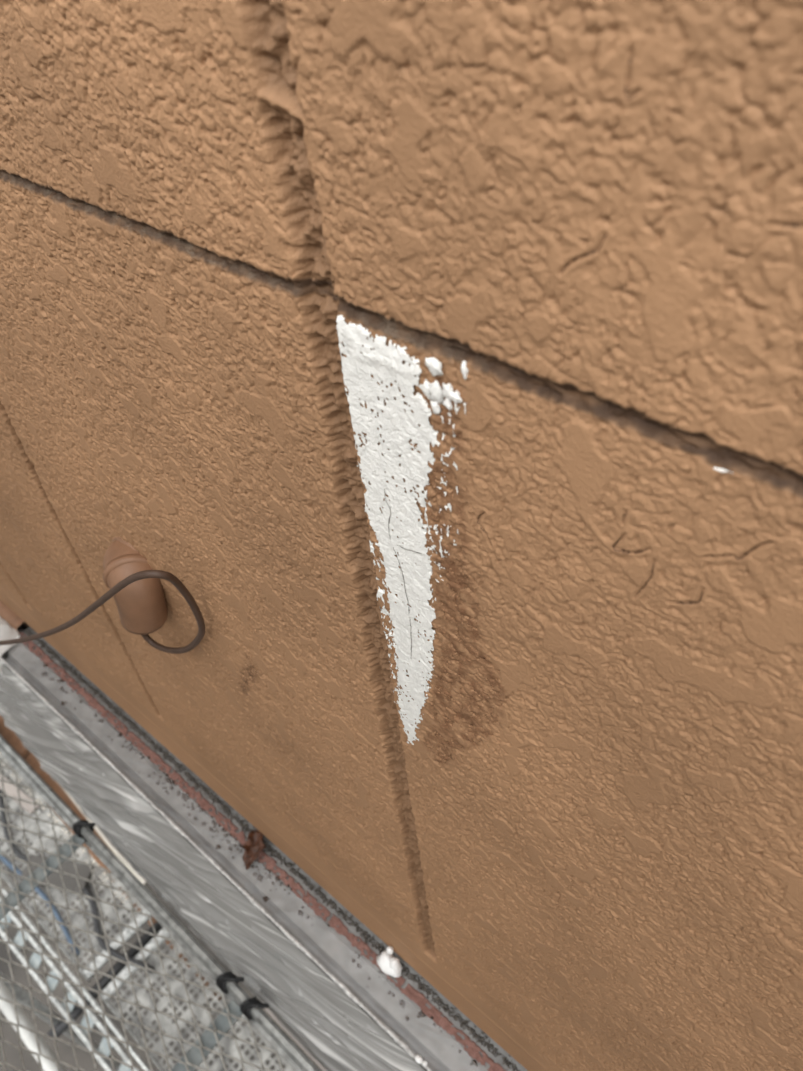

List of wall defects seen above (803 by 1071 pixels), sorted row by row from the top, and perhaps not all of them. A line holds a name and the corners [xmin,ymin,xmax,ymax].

crack [384,489,422,656]